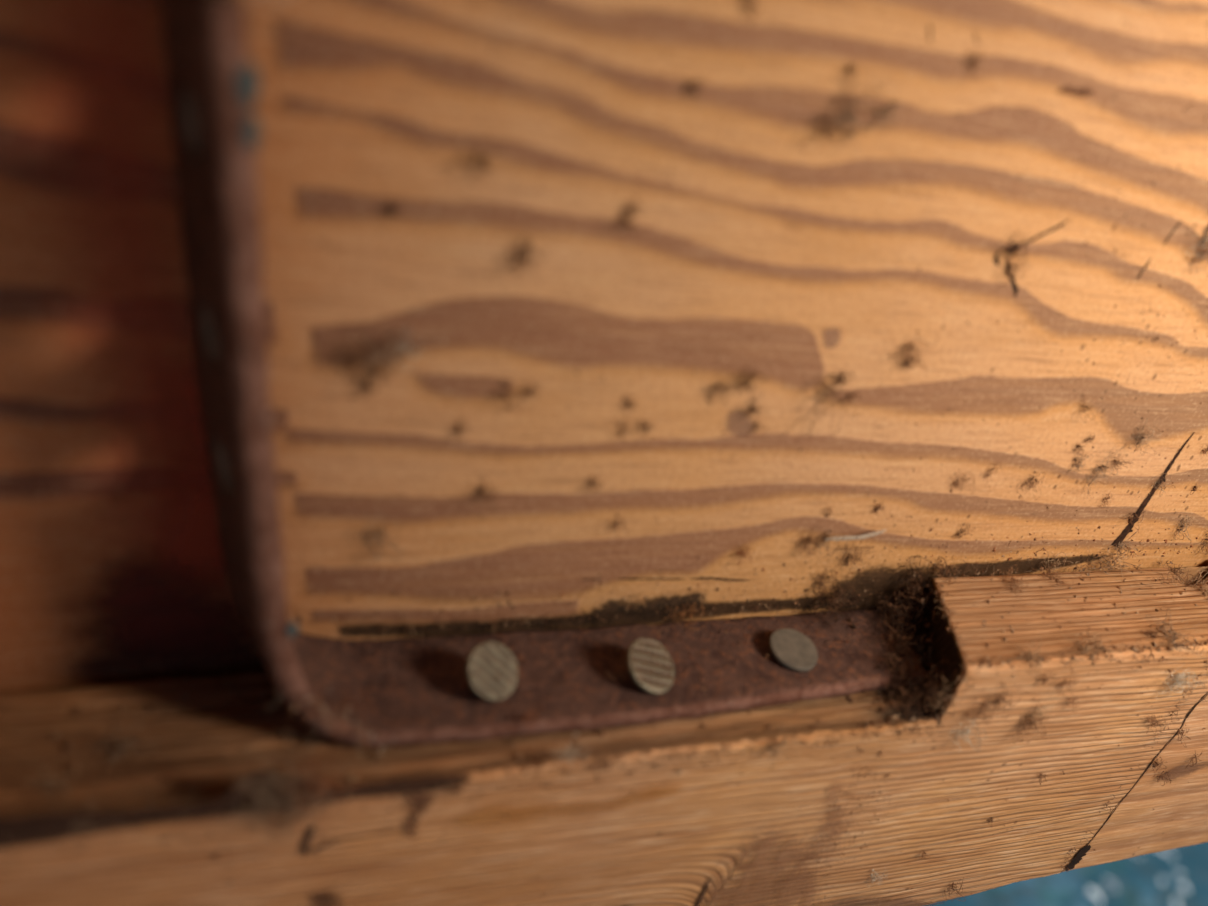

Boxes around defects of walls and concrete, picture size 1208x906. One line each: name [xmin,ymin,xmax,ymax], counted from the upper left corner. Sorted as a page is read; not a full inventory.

crack [1111,432,1195,547]
leakage [82,564,263,674]
crack [1065,694,1208,871]